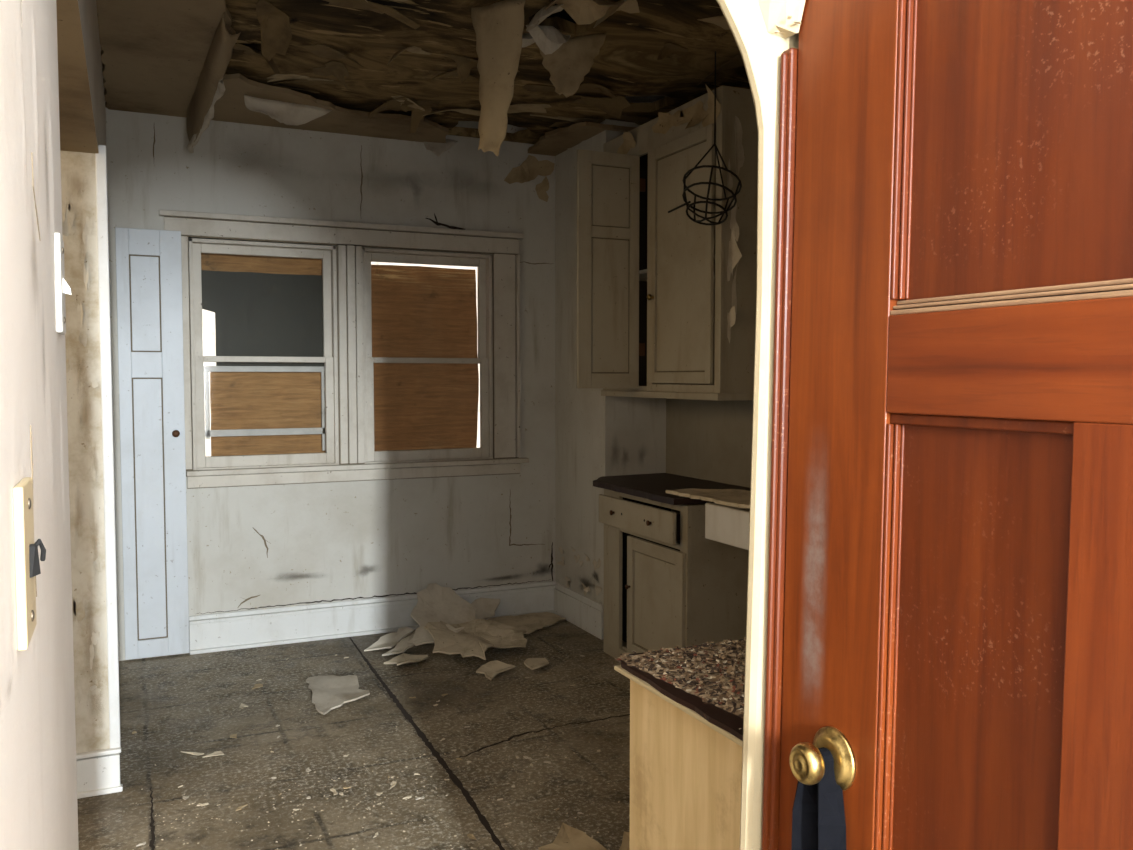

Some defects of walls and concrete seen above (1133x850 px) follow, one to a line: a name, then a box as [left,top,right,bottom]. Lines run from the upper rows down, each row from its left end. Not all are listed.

peeling [324,0,420,29]
peeling [697,16,731,30]
flaking render [186,12,241,153]
flaking render [244,95,332,126]
peeling [267,74,349,85]
flaking render [382,0,640,157]
peeling [617,54,744,154]
peeling [726,116,744,344]
crack [349,637,630,850]